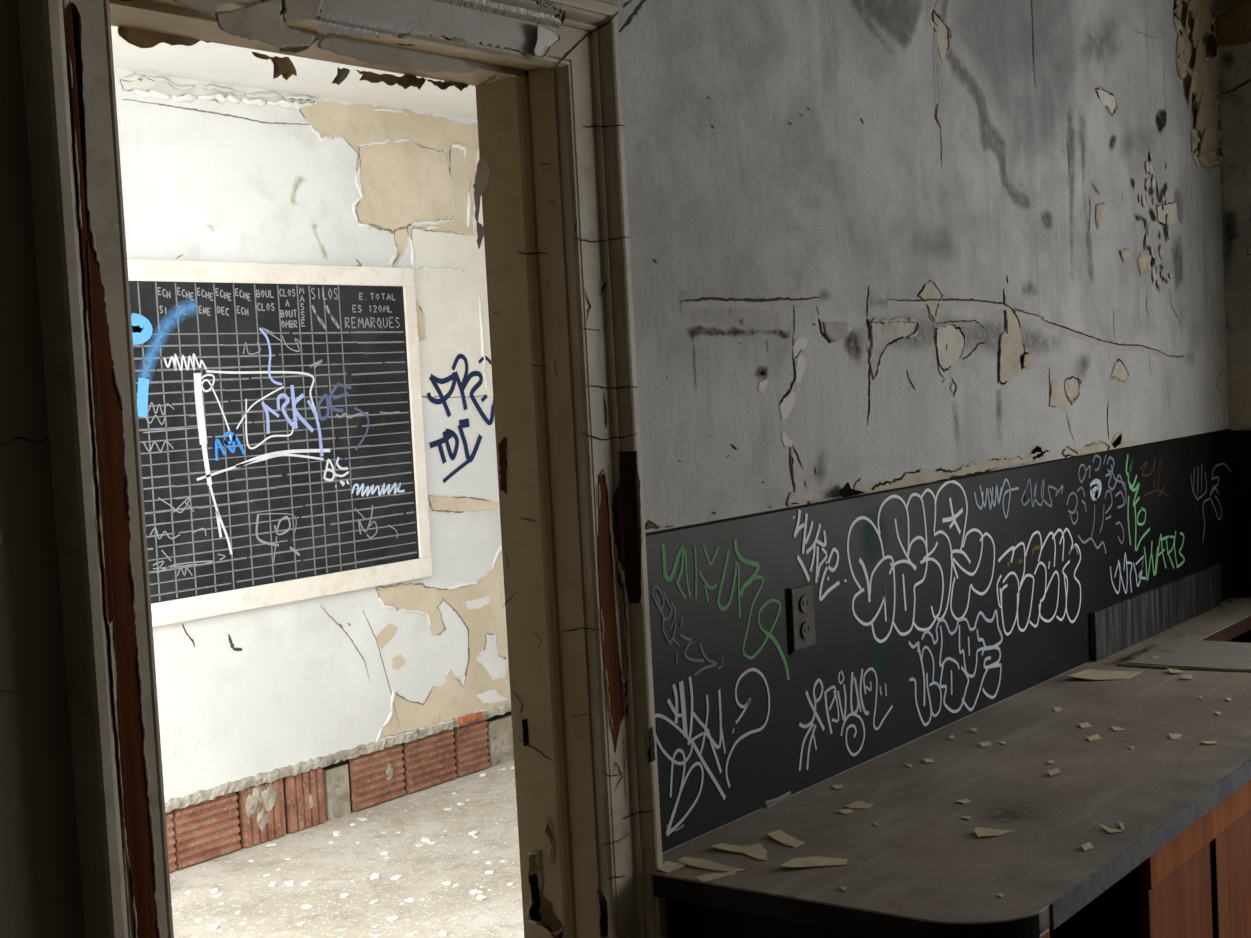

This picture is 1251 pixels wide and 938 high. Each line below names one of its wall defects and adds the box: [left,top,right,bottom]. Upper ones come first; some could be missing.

peeling [173,0,566,91]
peeling [933,8,952,62]
peeling [1096,86,1118,117]
peeling [1156,110,1167,131]
peeling [1173,0,1251,170]
peeling [1121,149,1178,291]
peeling [868,280,965,380]
peeling [999,304,1036,385]
crack [866,278,1186,420]
peeling [66,2,514,938]